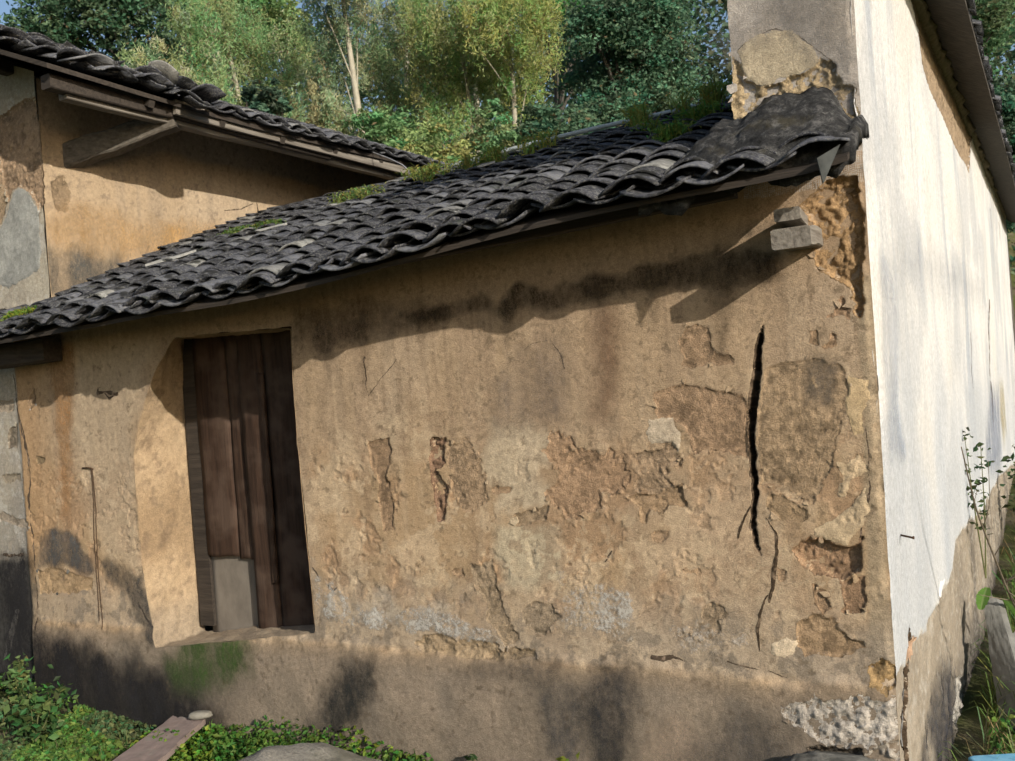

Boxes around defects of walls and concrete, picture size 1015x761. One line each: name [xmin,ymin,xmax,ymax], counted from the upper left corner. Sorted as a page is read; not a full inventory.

flaking render [727,52,860,119]
flaking render [911,0,971,172]
flaking render [0,93,71,226]
water stain [409,249,779,325]
flaking render [799,175,867,320]
flaking render [647,330,852,522]
water stain [43,529,92,573]
water stain [0,549,197,731]
water stain [320,661,375,746]
crack [727,325,787,678]
flaking render [792,535,867,658]
flaking render [781,634,917,761]